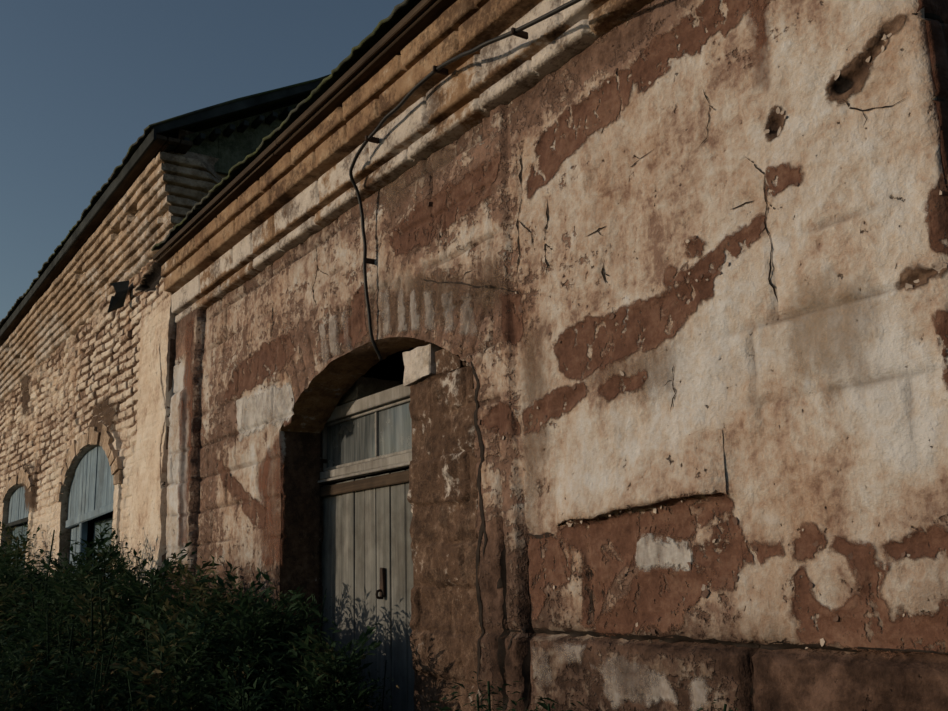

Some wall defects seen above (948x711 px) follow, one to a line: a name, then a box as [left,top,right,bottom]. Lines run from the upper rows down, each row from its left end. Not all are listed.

crack [420,142,554,293]
peeling [525,0,765,199]
crack [730,158,778,301]
spalling [764,106,786,142]
peeling [764,162,803,197]
spalling [825,14,907,104]
crack [844,98,905,127]
peeling [895,173,948,290]
peeling [477,213,766,439]
peeling [931,310,948,390]
crack [470,355,948,711]
peeling [528,491,948,657]